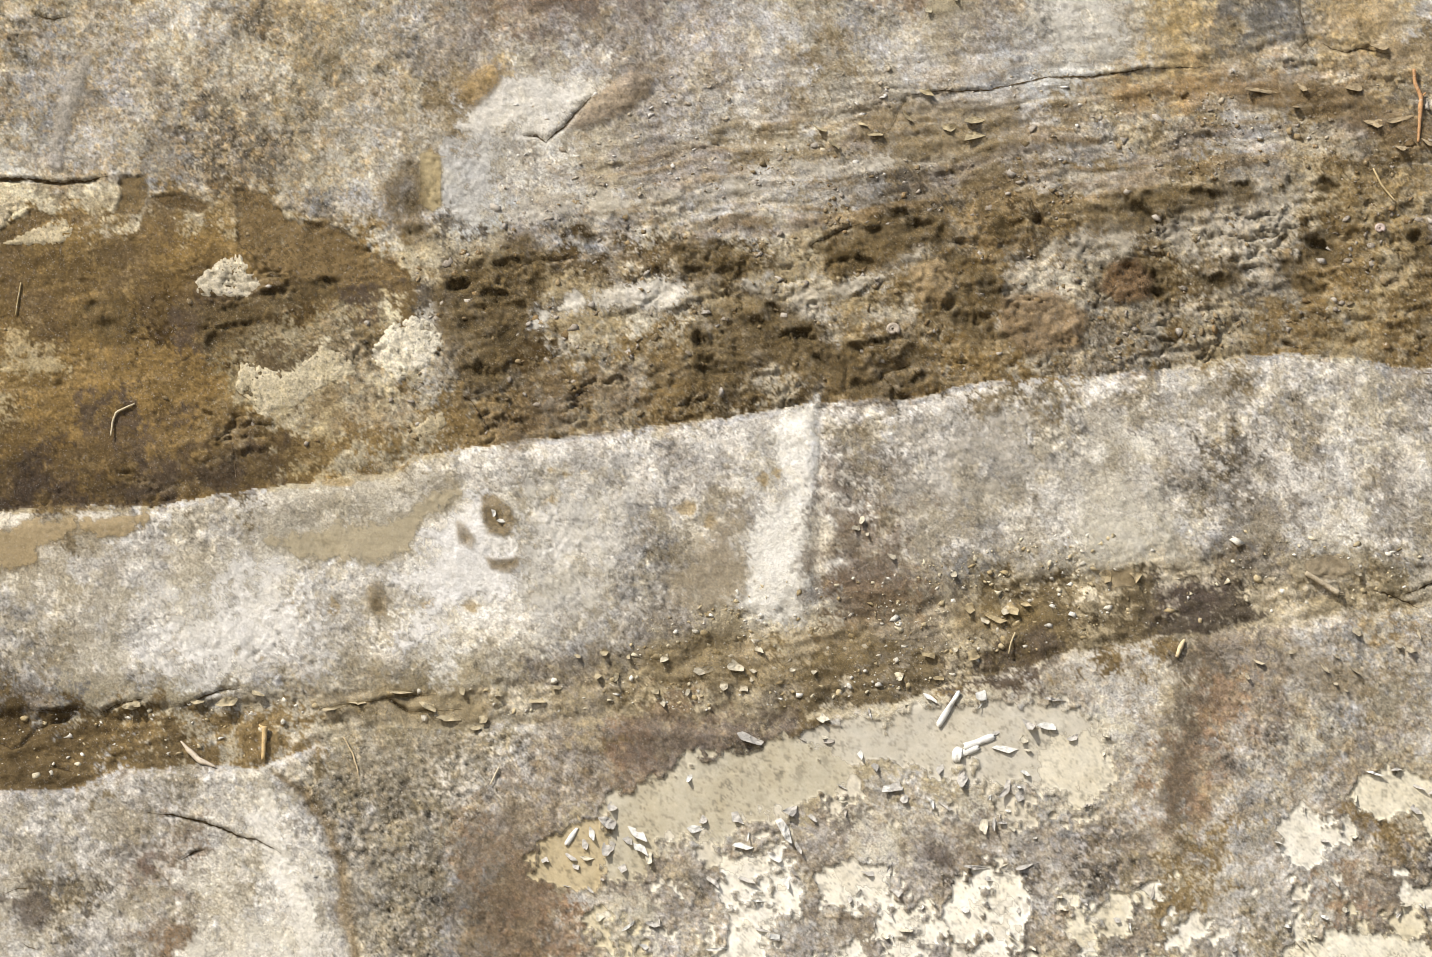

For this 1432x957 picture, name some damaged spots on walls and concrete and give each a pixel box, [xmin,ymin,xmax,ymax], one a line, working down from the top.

crack [888,66,1209,133]
crack [0,176,108,185]
peeling [965,601,1031,624]
peeling [685,645,764,696]
peeling [122,699,142,710]
peeling [190,690,265,706]
peeling [322,700,366,711]
peeling [389,690,488,730]
crack [148,812,279,860]
peeling [523,676,1118,957]
peeling [1275,763,1432,957]
peeling [1055,870,1258,957]